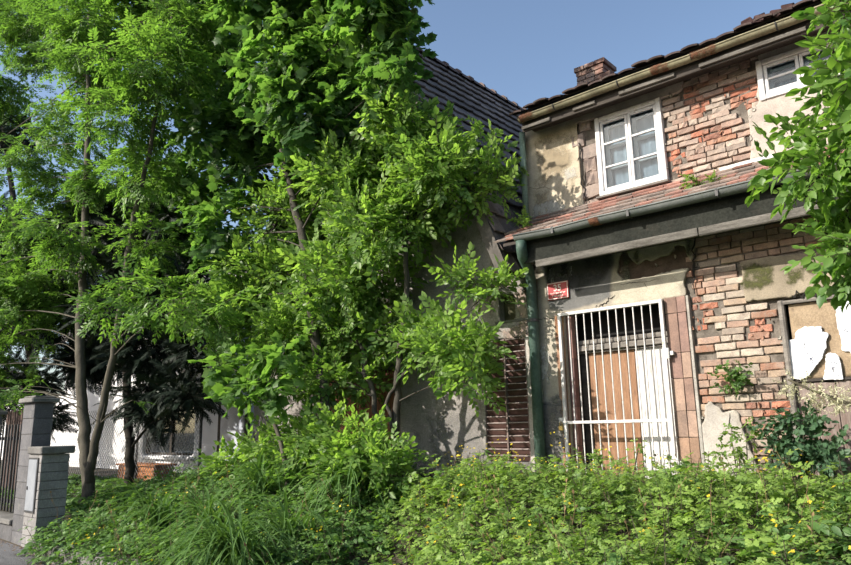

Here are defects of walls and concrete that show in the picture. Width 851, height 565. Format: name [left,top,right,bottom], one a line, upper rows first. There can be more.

spalling [661,56,759,182]
spalling [618,217,826,476]